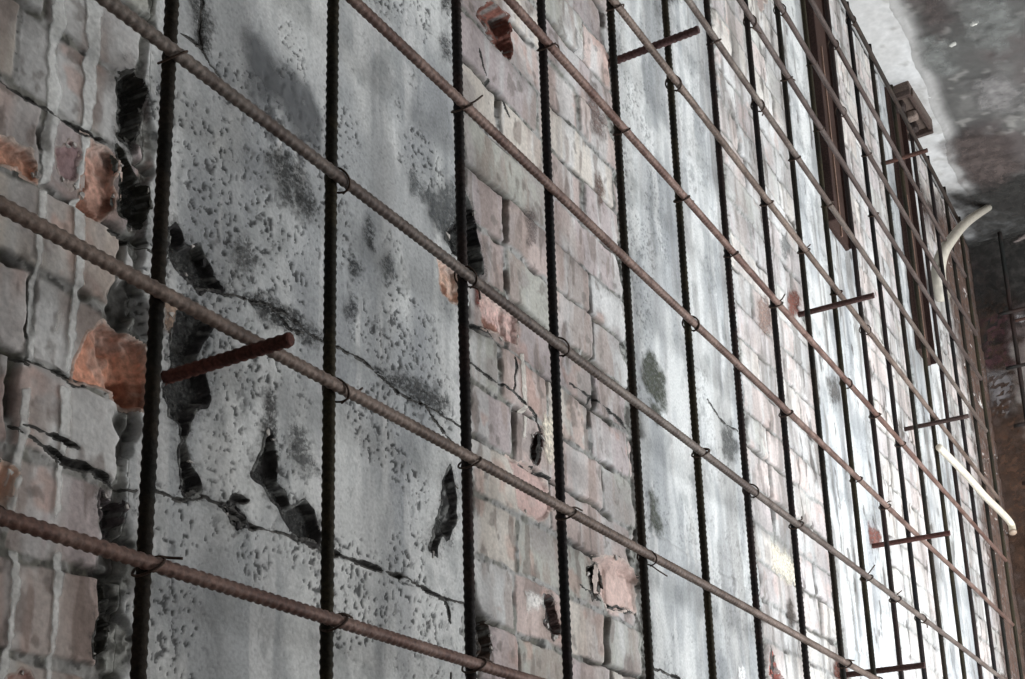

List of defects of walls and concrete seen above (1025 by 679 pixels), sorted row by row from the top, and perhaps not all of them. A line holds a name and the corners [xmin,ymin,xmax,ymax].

spalling [0,0,353,679]
crack [7,424,464,624]
crack [194,286,460,441]
spalling [338,0,855,679]
spalling [733,0,1001,505]
spalling [770,231,1025,679]
damp [952,133,1023,186]
damp [963,0,1020,52]
damp [974,73,1025,110]